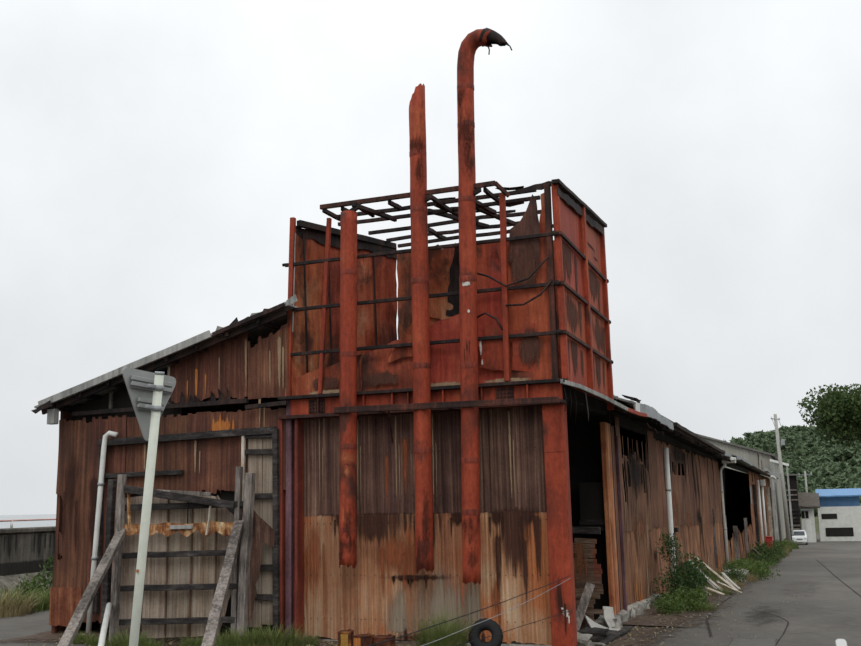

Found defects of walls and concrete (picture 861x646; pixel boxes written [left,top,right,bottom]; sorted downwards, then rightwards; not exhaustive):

corrosion [124,521,234,537]
corrosion [357,512,415,544]
corrosion [304,527,324,609]
corrosion [393,575,444,588]
corrosion [491,507,542,627]